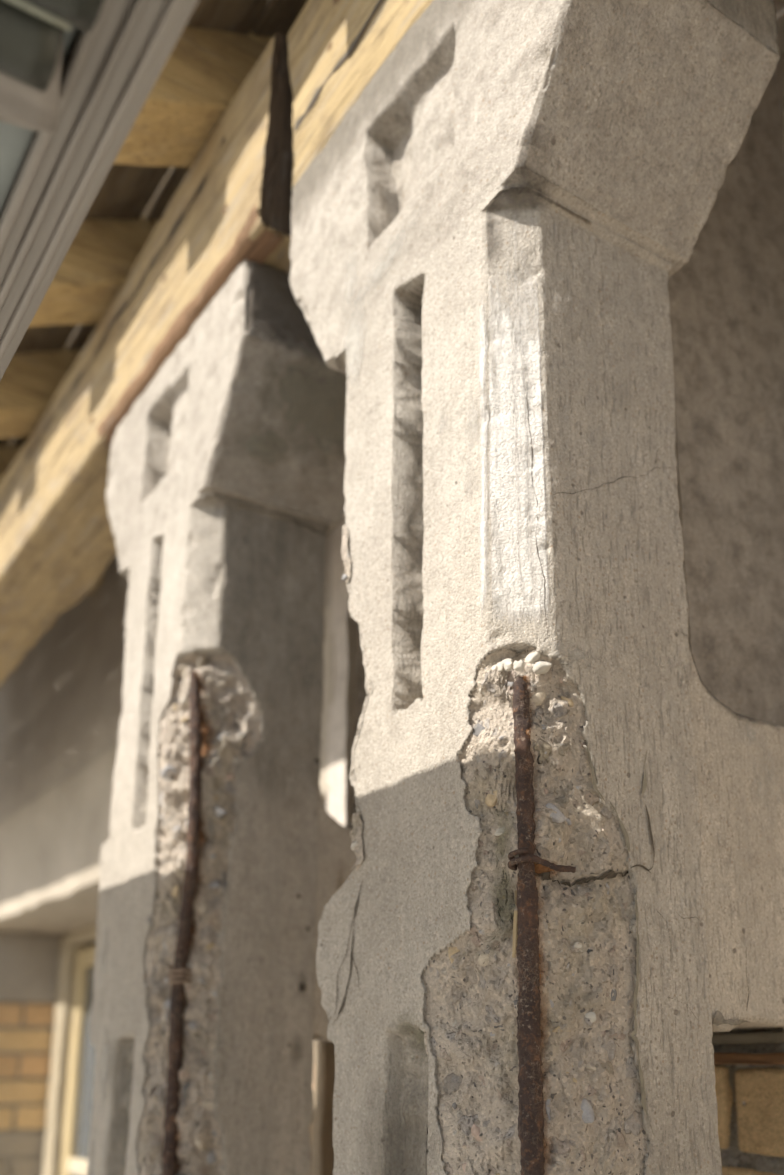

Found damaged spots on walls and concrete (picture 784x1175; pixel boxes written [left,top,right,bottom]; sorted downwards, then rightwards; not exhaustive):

spalling [341,524,351,583]
crack [519,386,673,636]
spalling [355,625,367,736]
spalling [349,804,364,871]
crack [534,752,655,887]
spalling [138,653,263,1175]
crack [334,880,363,1022]
spalling [422,647,653,1175]